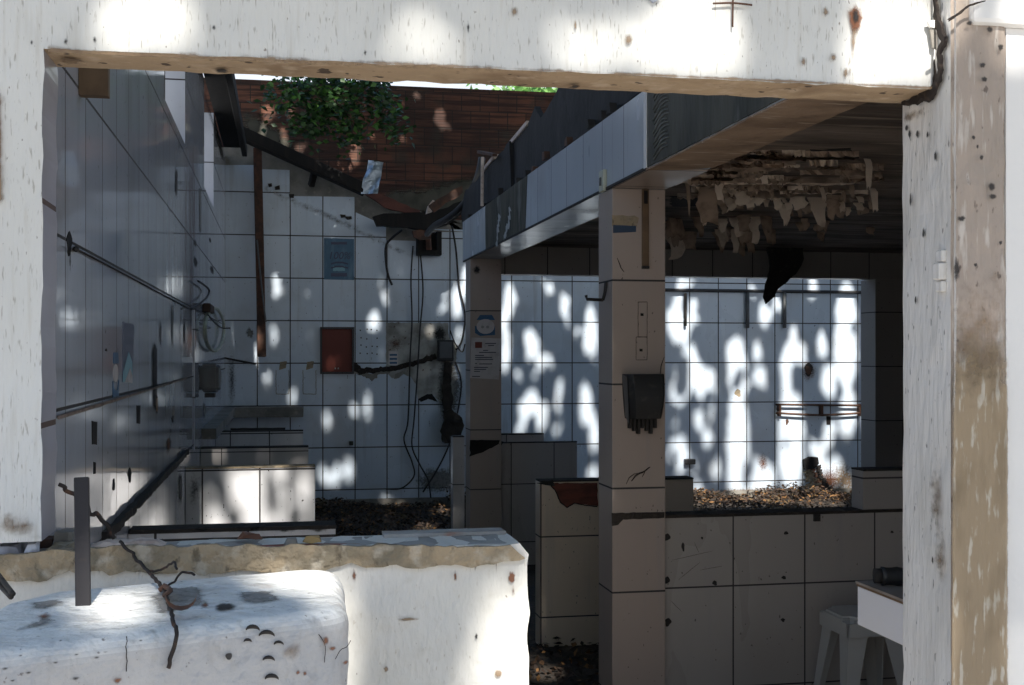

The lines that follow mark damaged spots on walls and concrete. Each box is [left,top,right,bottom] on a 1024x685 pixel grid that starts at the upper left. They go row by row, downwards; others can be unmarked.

corrosion [849,6,862,50]
crack [901,0,986,106]
peeling [665,148,884,260]
spalling [386,322,504,457]
spalling [538,480,598,508]
spalling [0,549,75,582]
spalling [90,537,525,612]